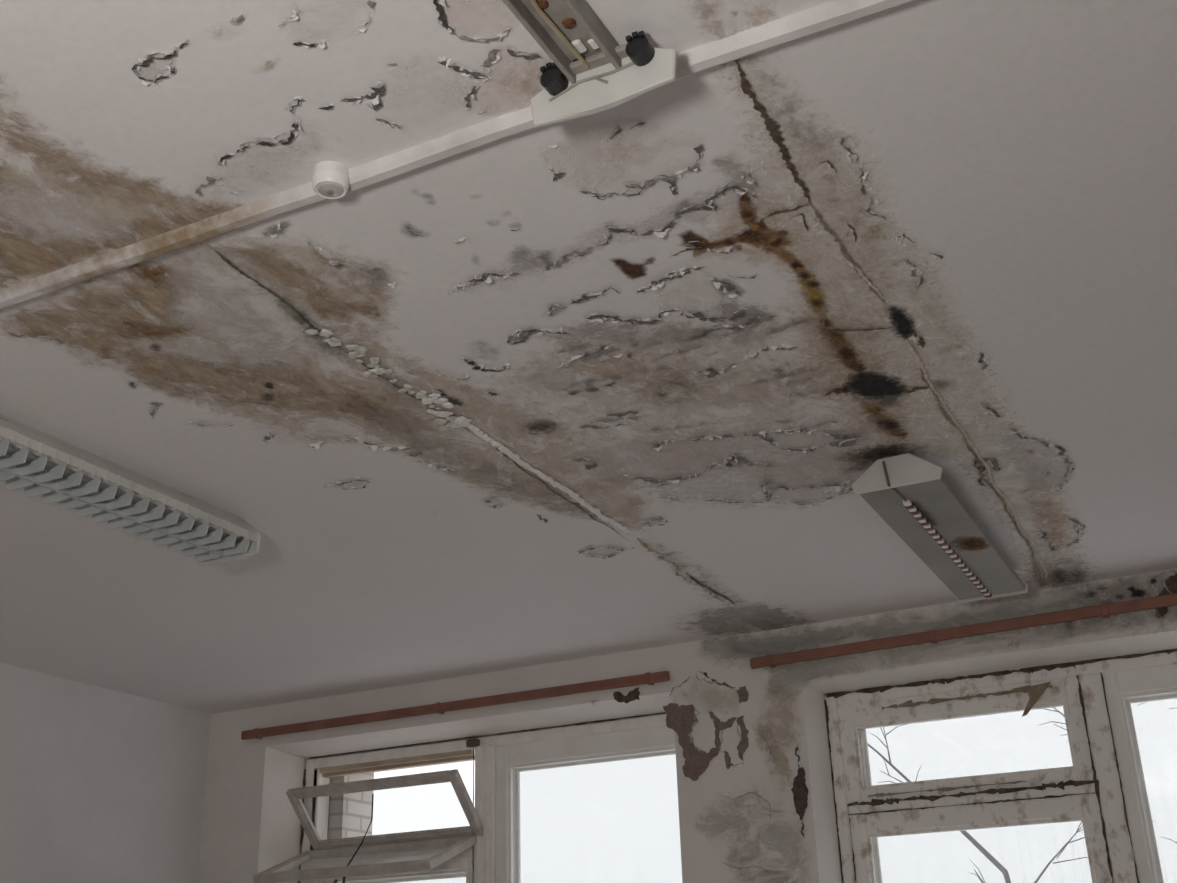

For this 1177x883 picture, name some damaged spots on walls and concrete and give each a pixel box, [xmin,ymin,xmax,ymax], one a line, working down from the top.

peeling [433,0,542,114]
damp [0,113,232,287]
damp [5,245,648,529]
crack [209,246,735,605]
rust [670,196,865,371]
peeling [449,58,1087,586]
rust [824,387,851,397]
rust [844,403,914,469]
crack [735,60,1047,581]
damp [688,562,1091,687]
spalling [663,671,749,781]
spalling [791,746,808,837]